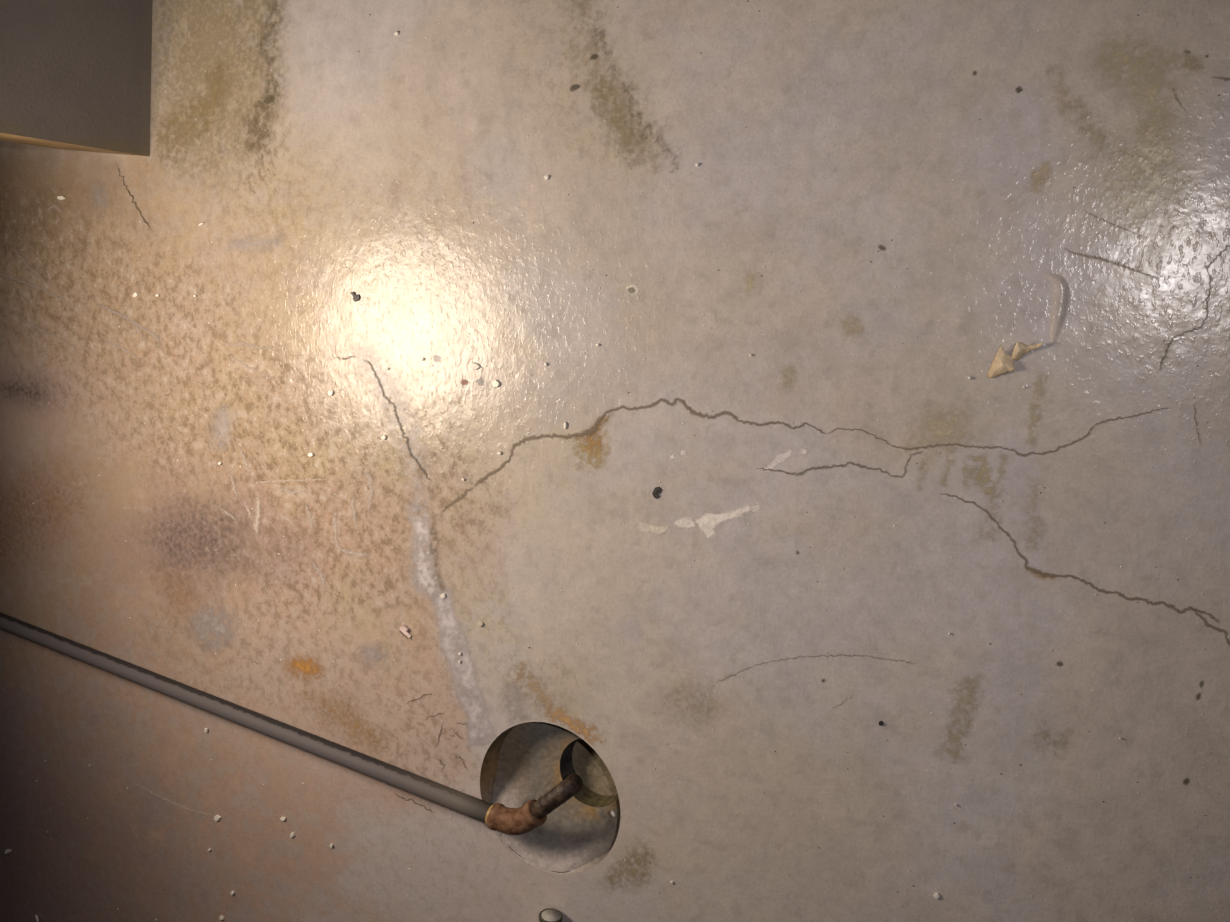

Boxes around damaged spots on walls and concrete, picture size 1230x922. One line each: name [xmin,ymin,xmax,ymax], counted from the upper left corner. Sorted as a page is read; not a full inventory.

leakage [161,0,278,170]
crack [337,356,430,480]
rust [575,416,608,468]
crack [443,399,1200,511]
crack [944,494,1230,645]